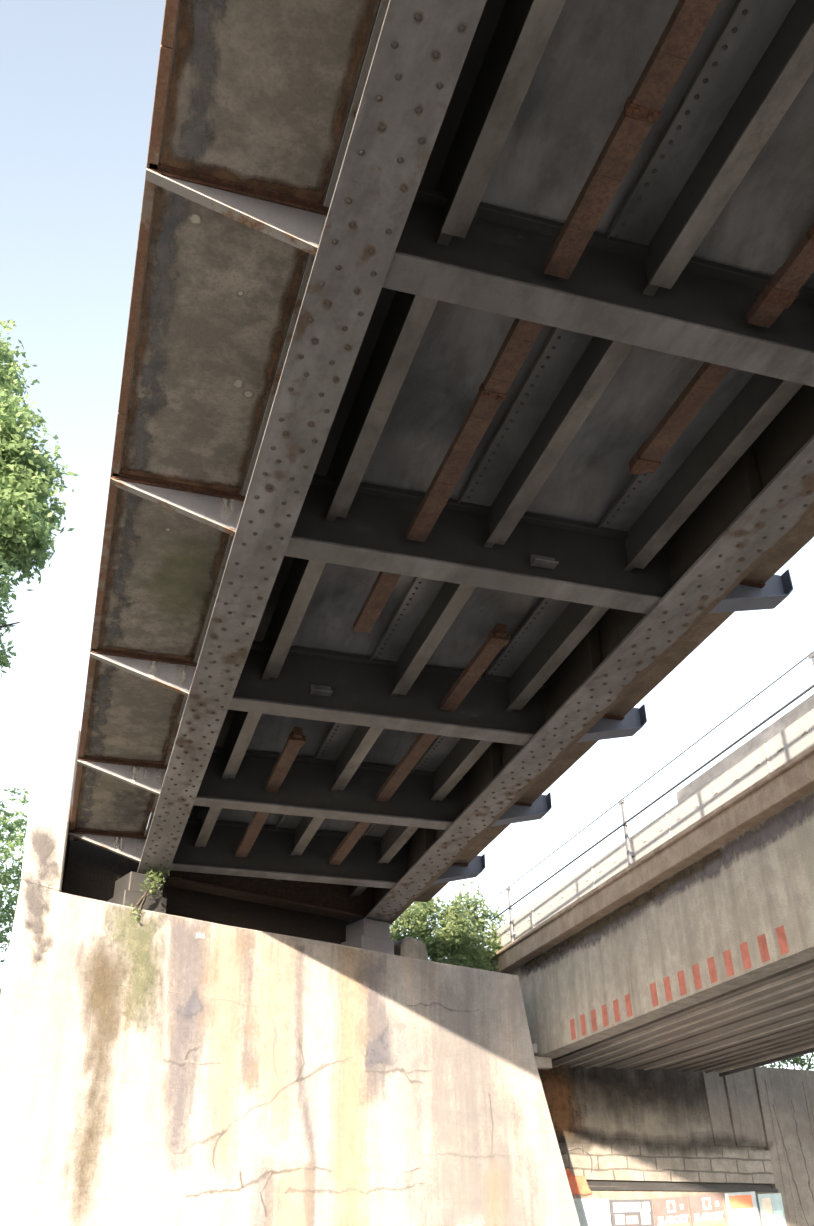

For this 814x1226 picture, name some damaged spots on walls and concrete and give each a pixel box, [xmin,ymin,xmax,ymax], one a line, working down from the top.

water stain [180,0,226,162]
rust [160,0,379,204]
rust [543,0,720,279]
water stain [127,193,190,470]
rust [746,224,814,328]
rust [406,318,543,542]
rust [629,362,732,475]
rust [440,623,510,711]
water stain [161,920,209,1148]
crack [212,1129,273,1216]
water stain [366,963,402,1099]
water stain [573,1067,707,1117]